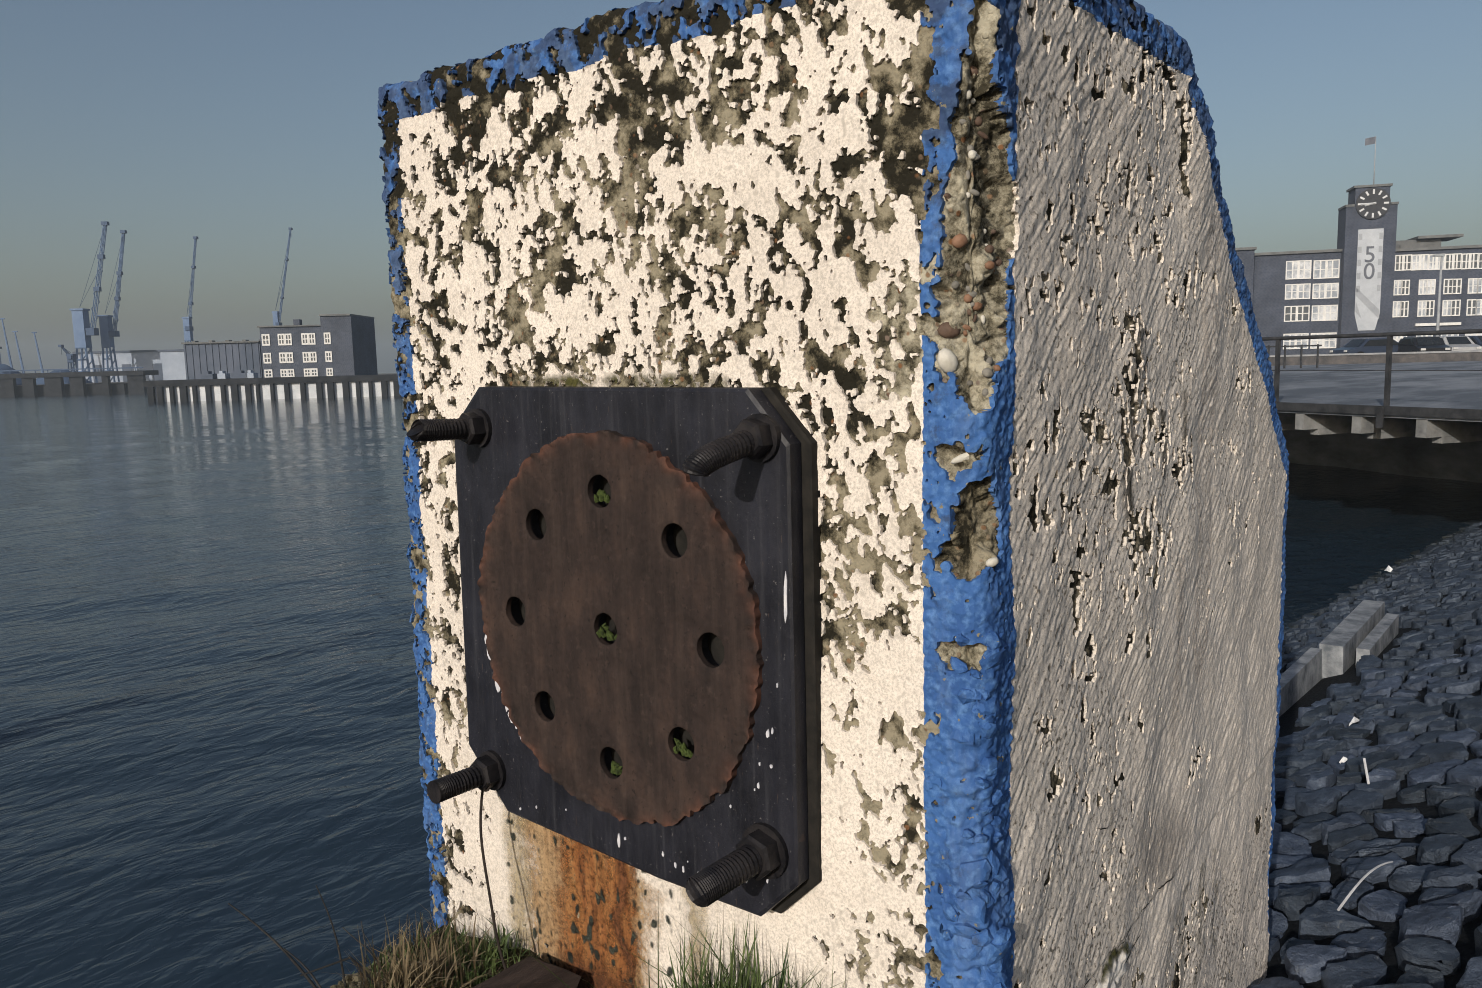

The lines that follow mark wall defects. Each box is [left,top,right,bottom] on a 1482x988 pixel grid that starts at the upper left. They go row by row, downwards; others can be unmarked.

peeling [381,0,1016,922]
corrosion [506,813,672,988]
corrosion [667,900,704,986]
peeling [814,702,974,988]